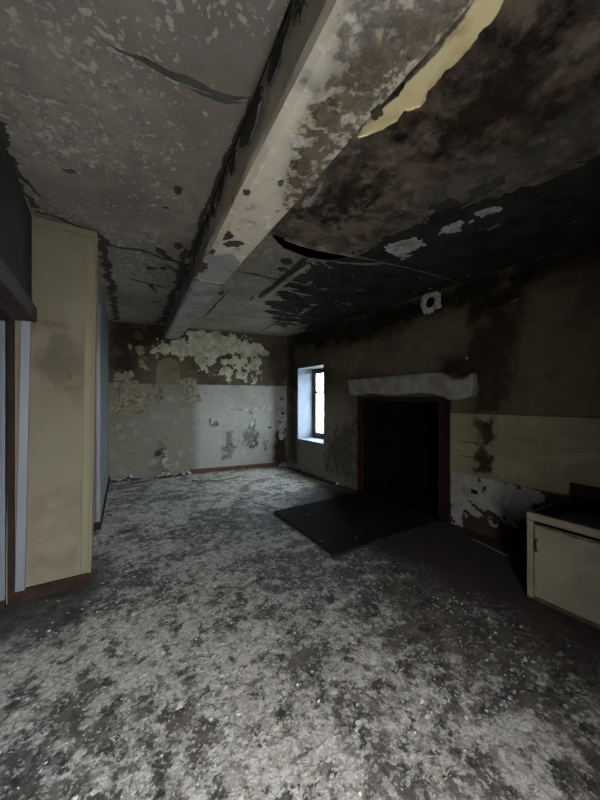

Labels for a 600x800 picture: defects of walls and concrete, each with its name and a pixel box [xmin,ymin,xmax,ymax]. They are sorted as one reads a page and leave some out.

crack [100,38,249,104]
peeling [153,0,309,324]
damp [284,0,473,230]
damp [389,0,592,163]
crack [239,271,280,284]
peeling [109,330,269,421]
damp [474,360,499,473]
peeling [450,471,545,537]